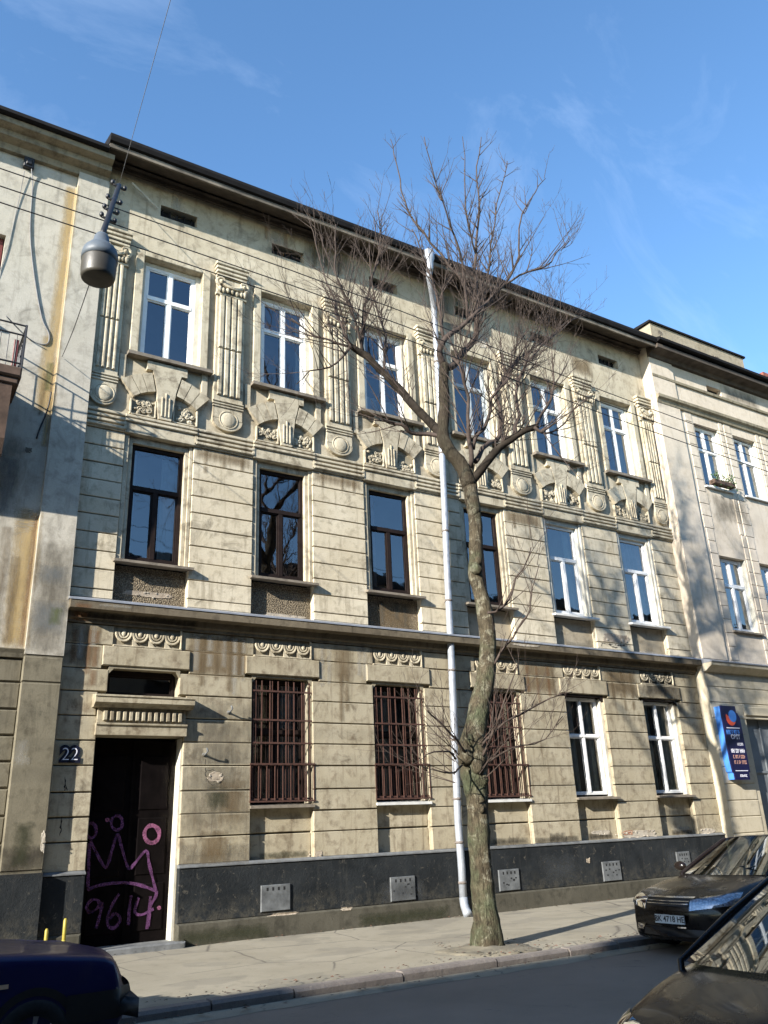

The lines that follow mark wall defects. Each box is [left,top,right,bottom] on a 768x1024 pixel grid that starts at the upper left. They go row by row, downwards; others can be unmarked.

leakage [38,189,77,445]
leakage [0,510,61,644]